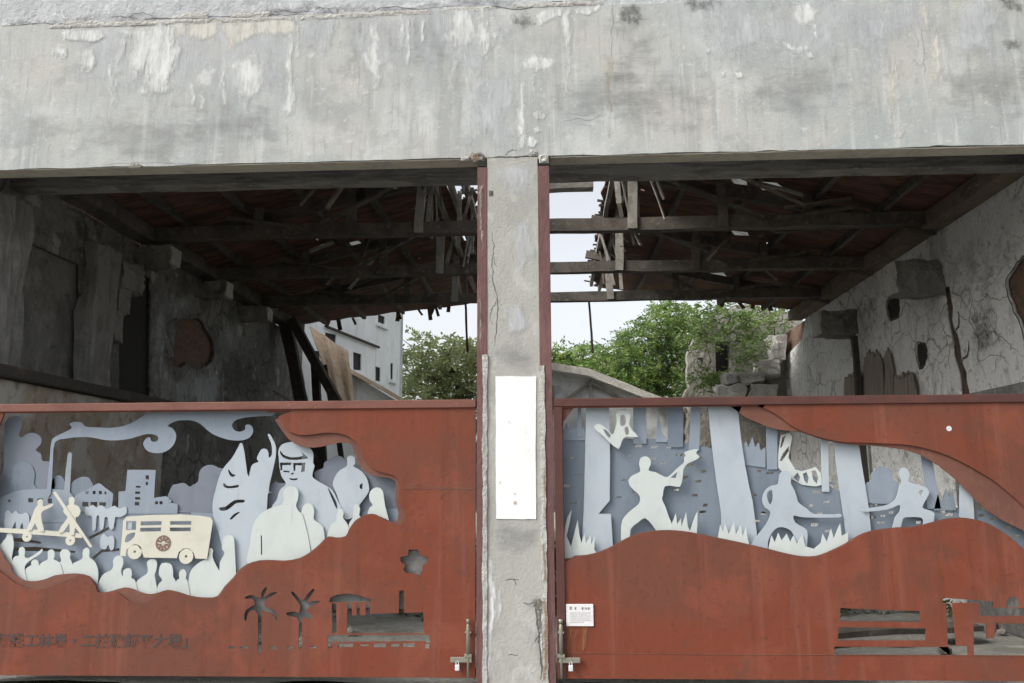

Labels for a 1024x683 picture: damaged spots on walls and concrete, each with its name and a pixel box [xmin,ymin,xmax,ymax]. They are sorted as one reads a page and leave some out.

leakage [54,6,335,114]
peeling [174,319,212,368]
crack [490,235,498,345]
crack [892,286,1018,394]